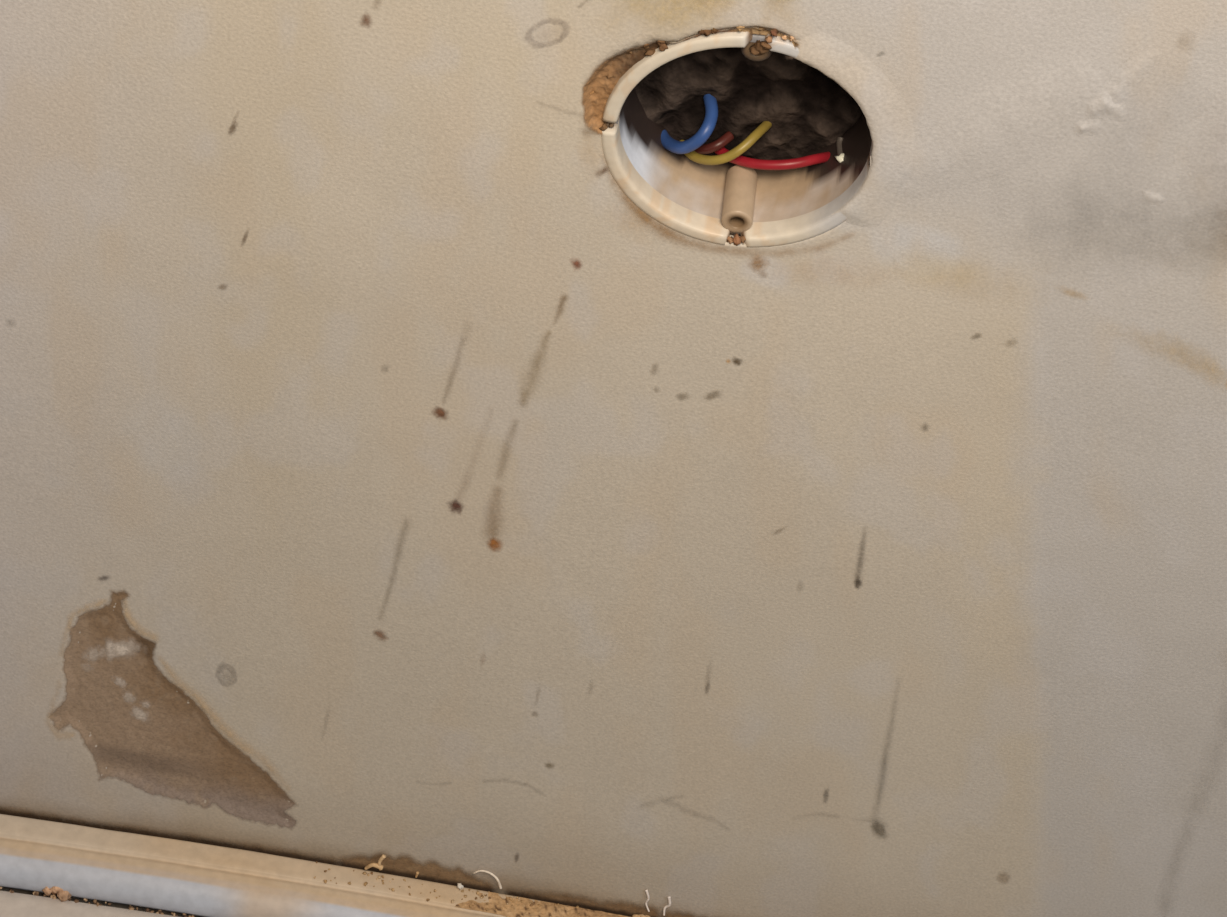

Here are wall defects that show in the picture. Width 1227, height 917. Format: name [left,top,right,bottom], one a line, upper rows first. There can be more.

peeling [50,592,296,828]